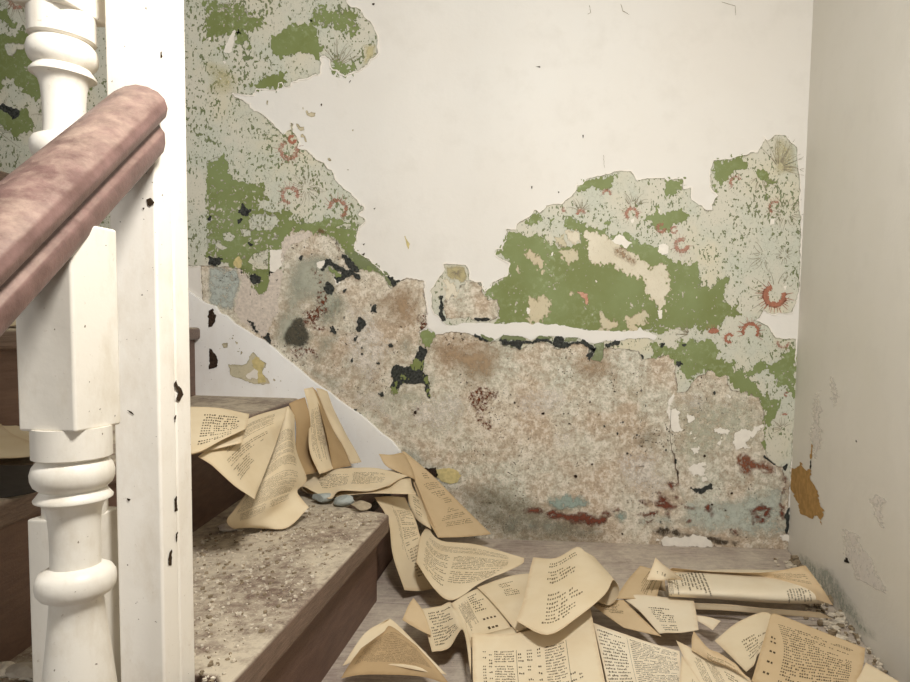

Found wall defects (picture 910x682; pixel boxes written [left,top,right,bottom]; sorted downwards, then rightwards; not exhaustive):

peeling [0,0,42,173]
peeling [86,27,107,112]
flaking render [184,0,824,550]